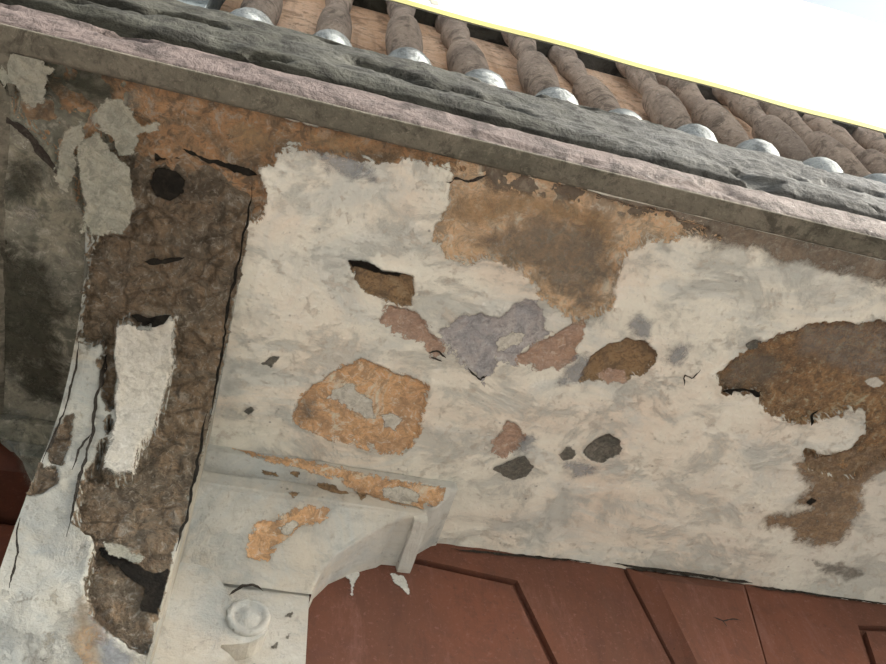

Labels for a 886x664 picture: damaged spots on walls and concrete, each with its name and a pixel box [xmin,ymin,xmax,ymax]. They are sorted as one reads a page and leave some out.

crack [6,117,57,174]
crack [42,341,80,462]
crack [66,351,107,537]
spalling [0,53,724,654]
spalling [712,319,886,546]
crack [9,518,20,588]